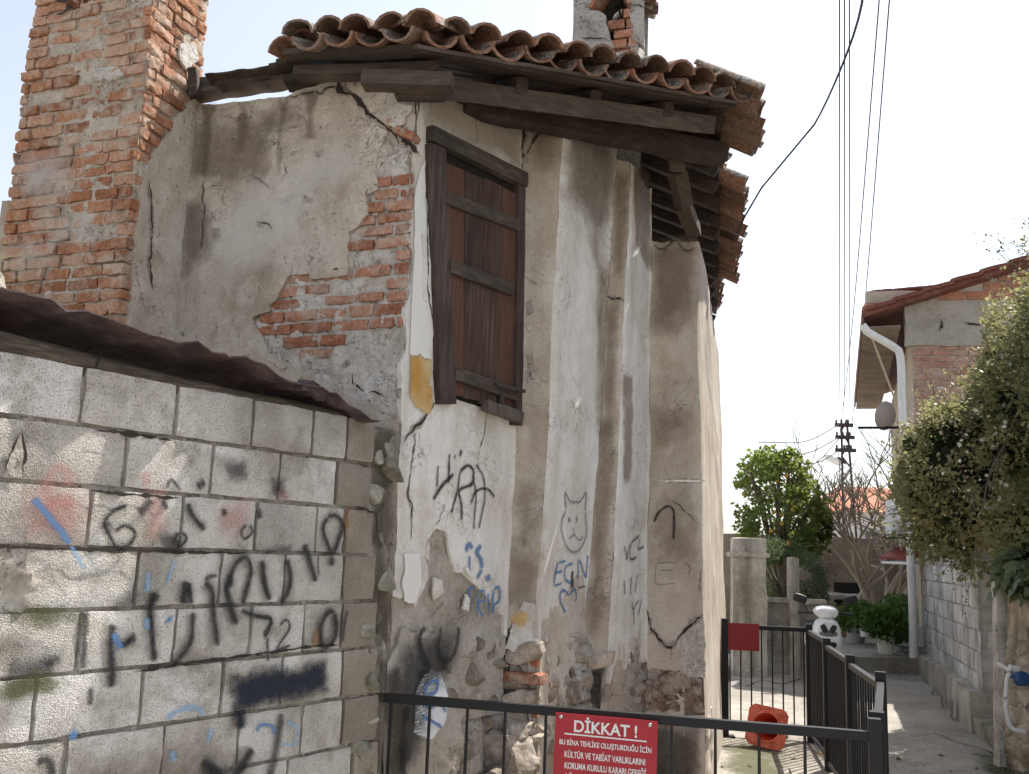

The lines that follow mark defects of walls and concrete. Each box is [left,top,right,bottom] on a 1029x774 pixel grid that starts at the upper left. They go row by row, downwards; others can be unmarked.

spalling [64,0,96,11]
crack [287,82,421,156]
crack [147,178,155,289]
spalling [250,132,434,419]
crack [350,507,378,539]
crack [404,403,445,537]
flaking render [387,529,560,721]
crack [647,570,704,660]